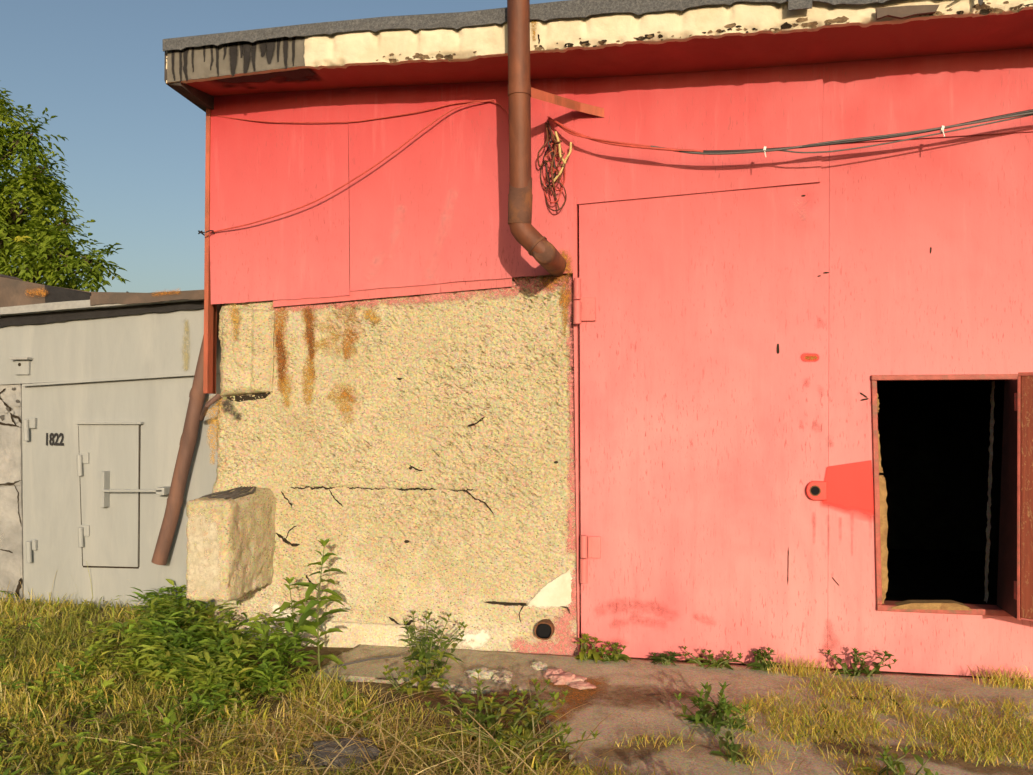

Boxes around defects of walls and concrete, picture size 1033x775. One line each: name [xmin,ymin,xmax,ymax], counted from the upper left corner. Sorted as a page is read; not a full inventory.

spalling [919,1,1033,16]
leakage [167,36,319,89]
spalling [534,38,620,51]
spalling [633,16,849,41]
rust [274,306,290,407]
rust [302,300,379,405]
spalling [0,387,21,423]
rust [327,387,355,422]
crack [276,465,493,547]
crack [484,601,528,622]